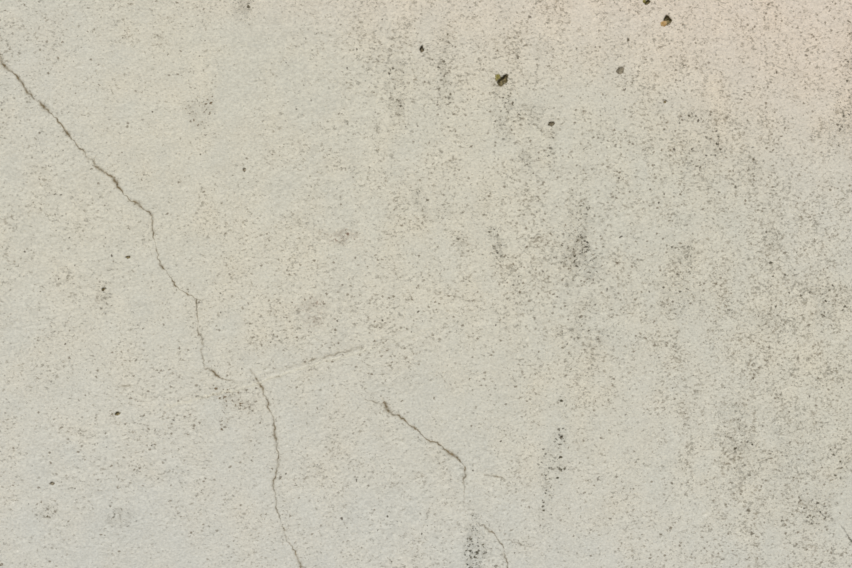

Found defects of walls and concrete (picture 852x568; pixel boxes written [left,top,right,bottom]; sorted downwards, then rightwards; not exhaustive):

crack [2,64,199,334]
crack [373,401,466,477]